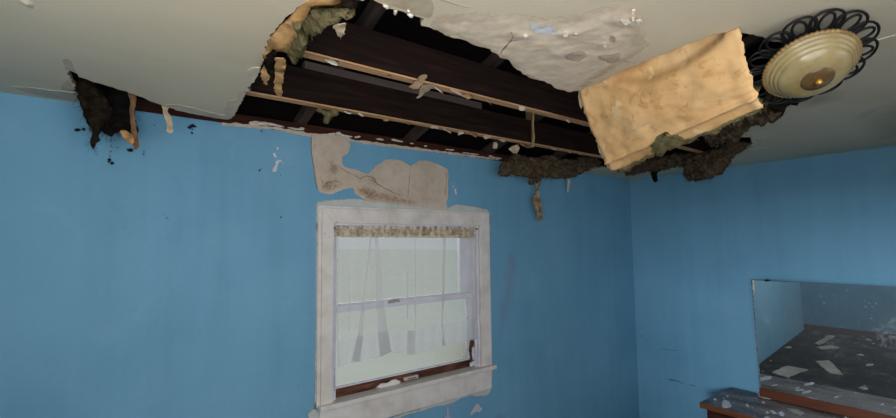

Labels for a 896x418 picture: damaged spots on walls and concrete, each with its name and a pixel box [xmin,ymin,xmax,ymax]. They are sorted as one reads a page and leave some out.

peeling [221,121,502,211]